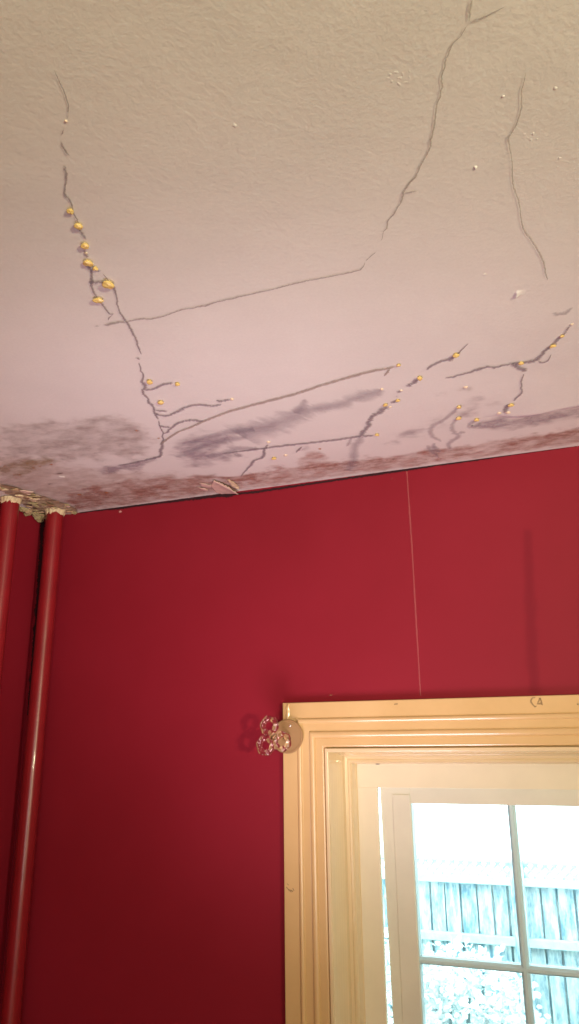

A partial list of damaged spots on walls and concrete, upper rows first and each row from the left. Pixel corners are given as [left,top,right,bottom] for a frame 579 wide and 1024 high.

crack [55,3,500,465]
crack [508,74,547,278]
flaking render [0,484,77,522]
peeling [198,480,240,494]
water stain [158,364,401,460]
crack [80,323,576,513]